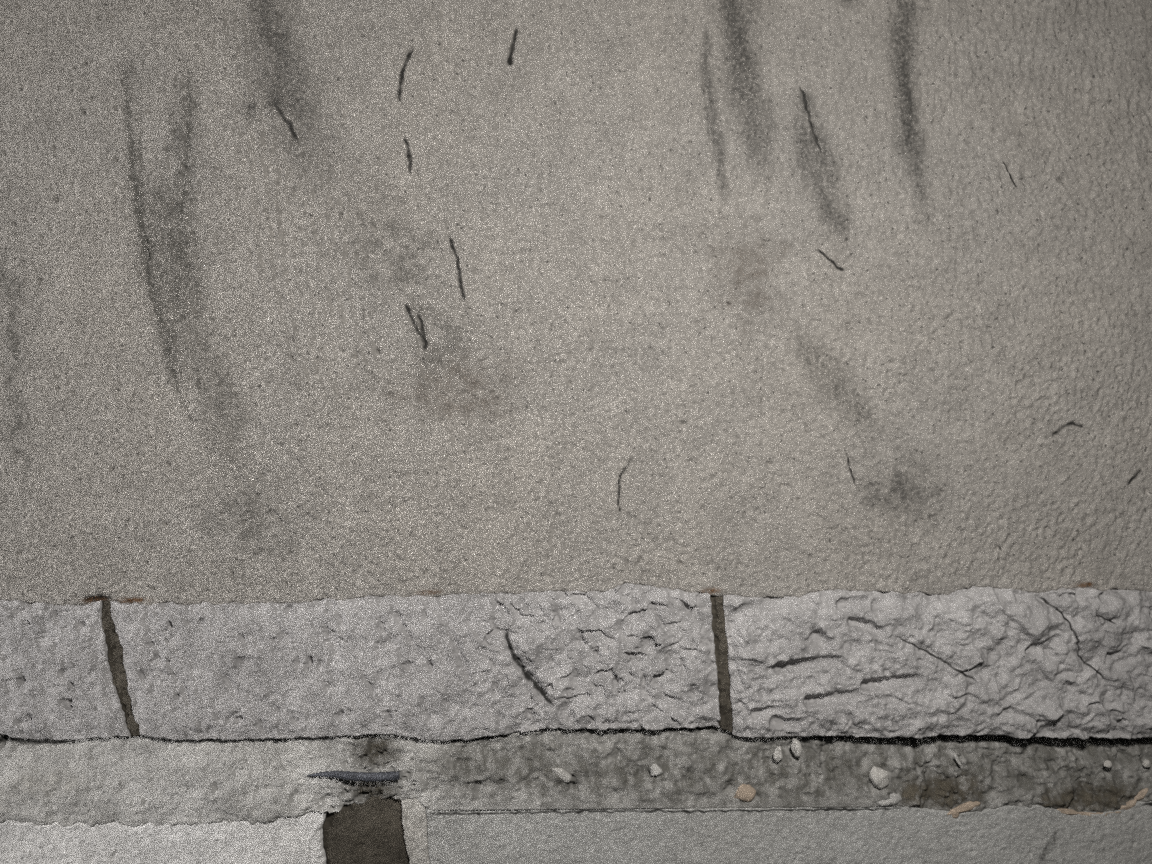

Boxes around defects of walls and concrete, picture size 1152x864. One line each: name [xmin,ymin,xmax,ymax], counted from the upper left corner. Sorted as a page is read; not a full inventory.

spalling [359,738,391,764]
spalling [773,738,802,762]
spalling [551,767,572,783]
spalling [650,763,663,776]
spalling [869,766,890,790]
spalling [354,782,390,799]
spalling [734,784,756,802]
spalling [902,781,981,818]
spalling [1042,785,1149,816]